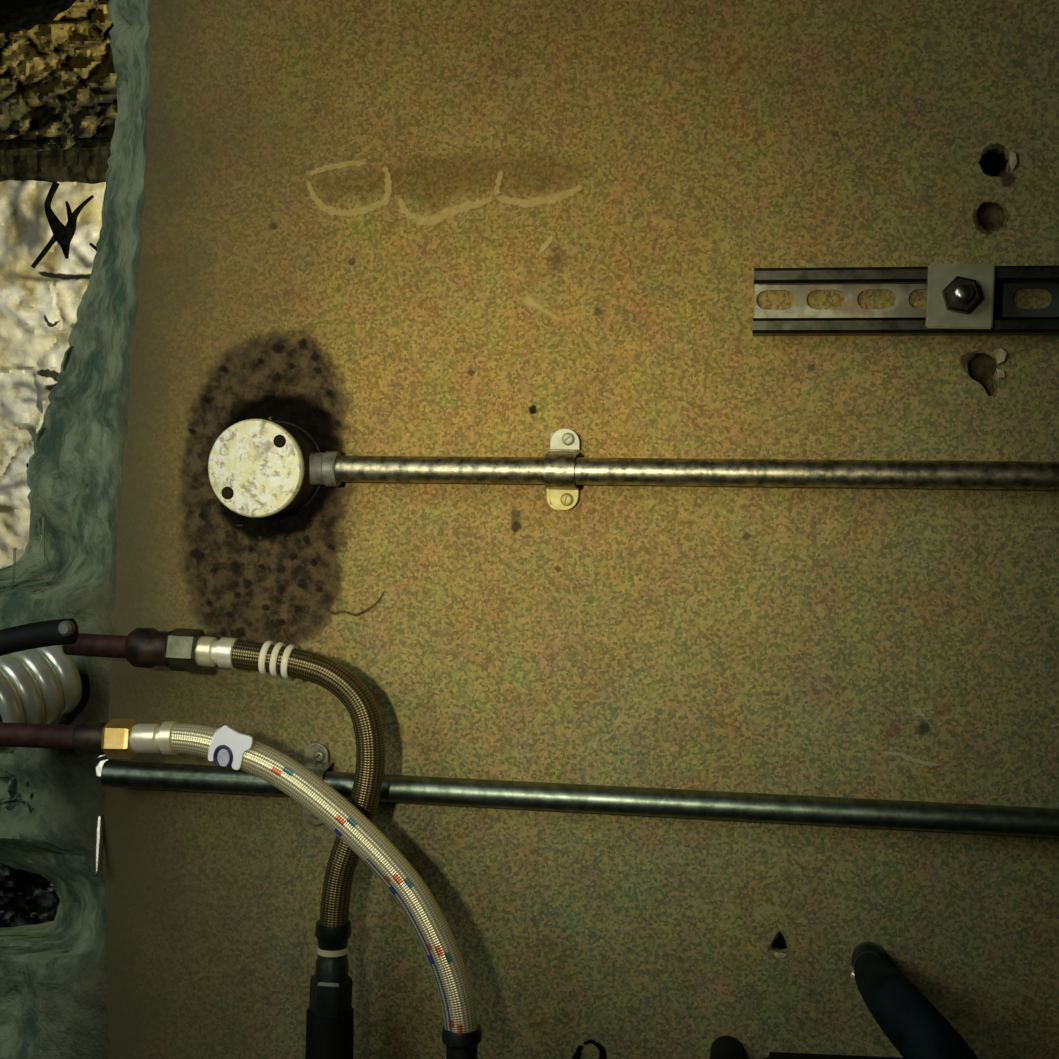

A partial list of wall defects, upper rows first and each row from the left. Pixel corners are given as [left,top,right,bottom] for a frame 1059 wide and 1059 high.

damp [307,160,582,226]
crack [38,271,91,280]
crack [44,315,60,327]
crack [37,369,59,391]